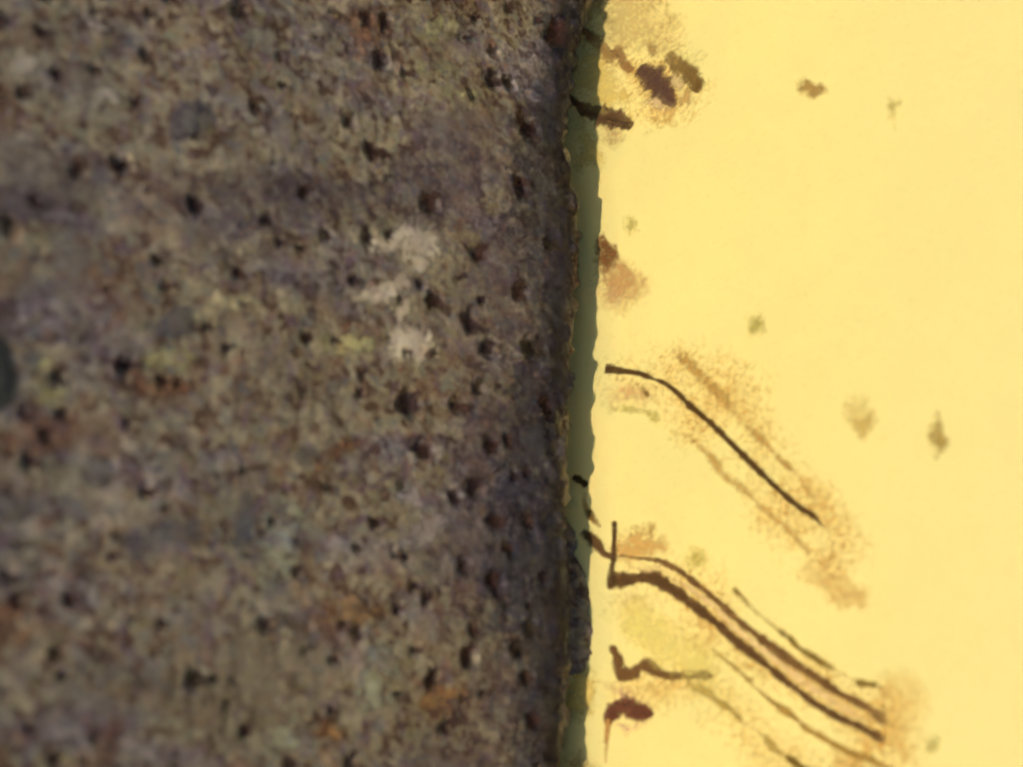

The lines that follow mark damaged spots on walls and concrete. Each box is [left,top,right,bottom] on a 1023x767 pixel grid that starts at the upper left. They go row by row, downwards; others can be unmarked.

leakage [323,215,443,370]
corrosion [596,235,643,300]